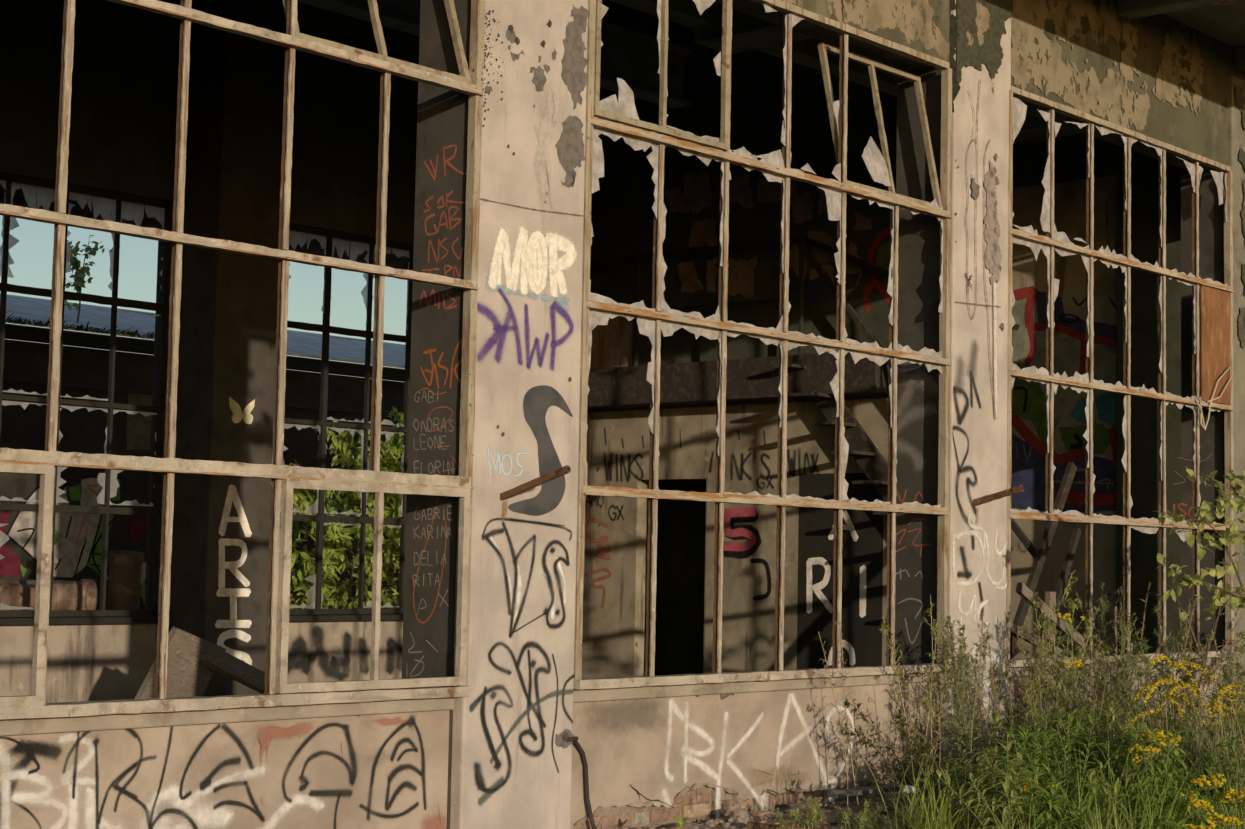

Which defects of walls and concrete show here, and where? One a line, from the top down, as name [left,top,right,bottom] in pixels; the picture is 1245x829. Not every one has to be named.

peeling [482,10,524,127]
peeling [530,5,589,188]
peeling [827,0,1203,131]
spalling [573,780,868,829]